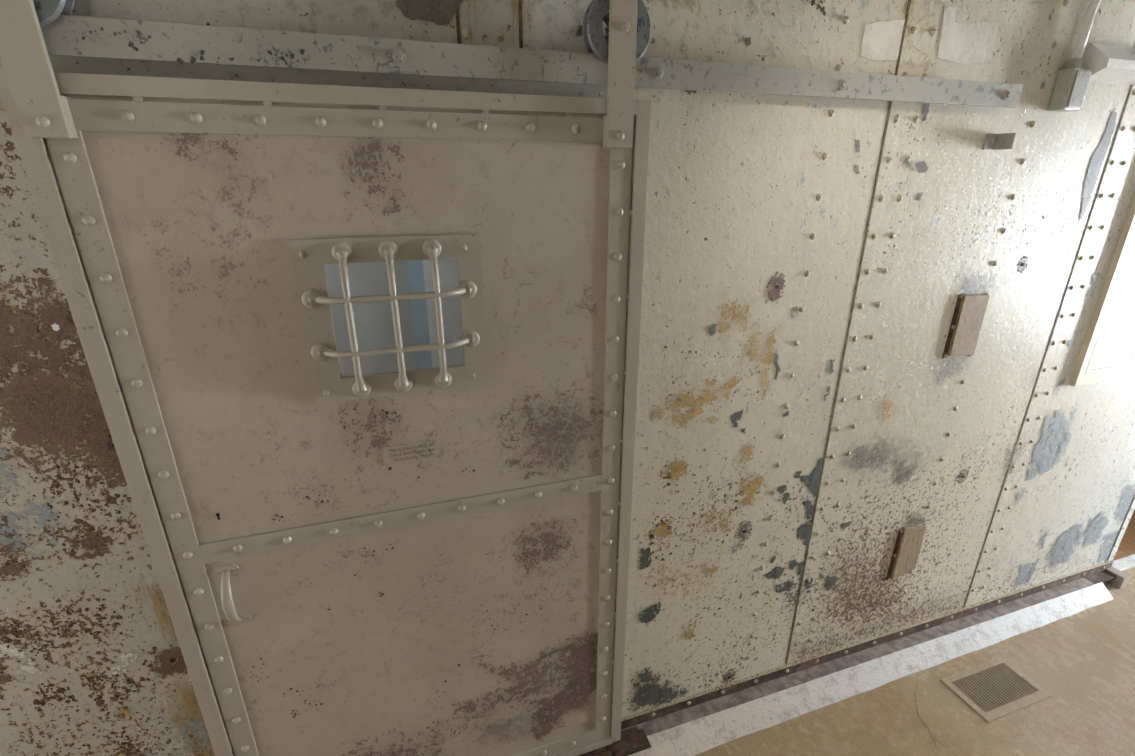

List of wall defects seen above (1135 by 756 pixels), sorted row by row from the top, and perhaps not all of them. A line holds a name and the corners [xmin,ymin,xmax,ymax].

peeling [730,400,746,434]
peeling [1013,406,1135,507]
peeling [640,465,739,607]
peeling [766,458,823,546]
peeling [987,476,1135,588]
spalling [0,591,134,661]
peeling [634,598,665,624]
peeling [765,555,836,612]
rust [787,533,977,665]
spalling [19,646,213,756]
peeling [629,667,689,712]